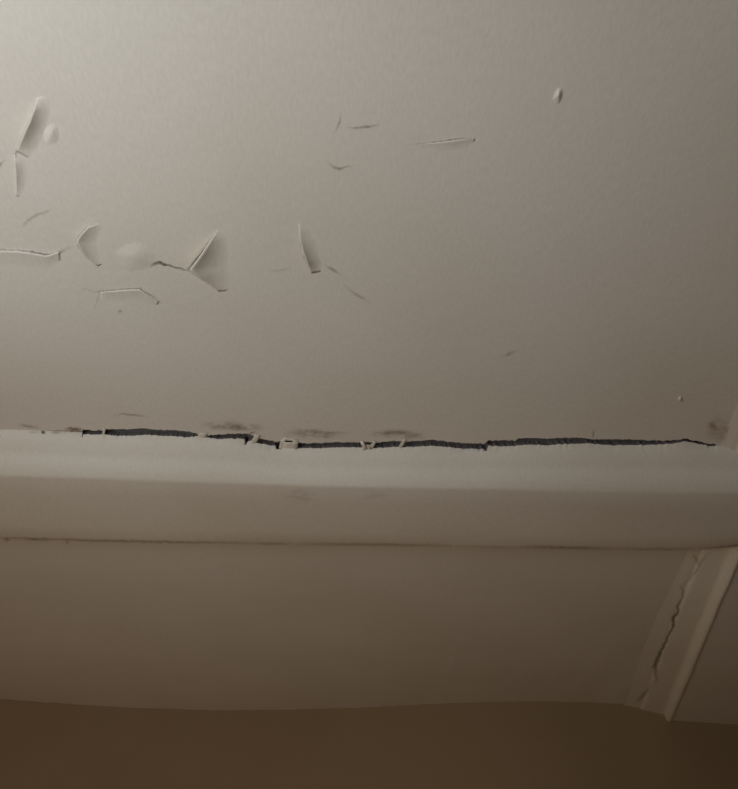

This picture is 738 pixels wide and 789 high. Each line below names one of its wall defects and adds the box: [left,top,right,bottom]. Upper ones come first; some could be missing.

peeling [14,96,50,197]
crack [419,138,475,151]
peeling [77,224,102,266]
peeling [190,230,229,292]
peeling [299,224,321,274]
crack [69,428,716,450]